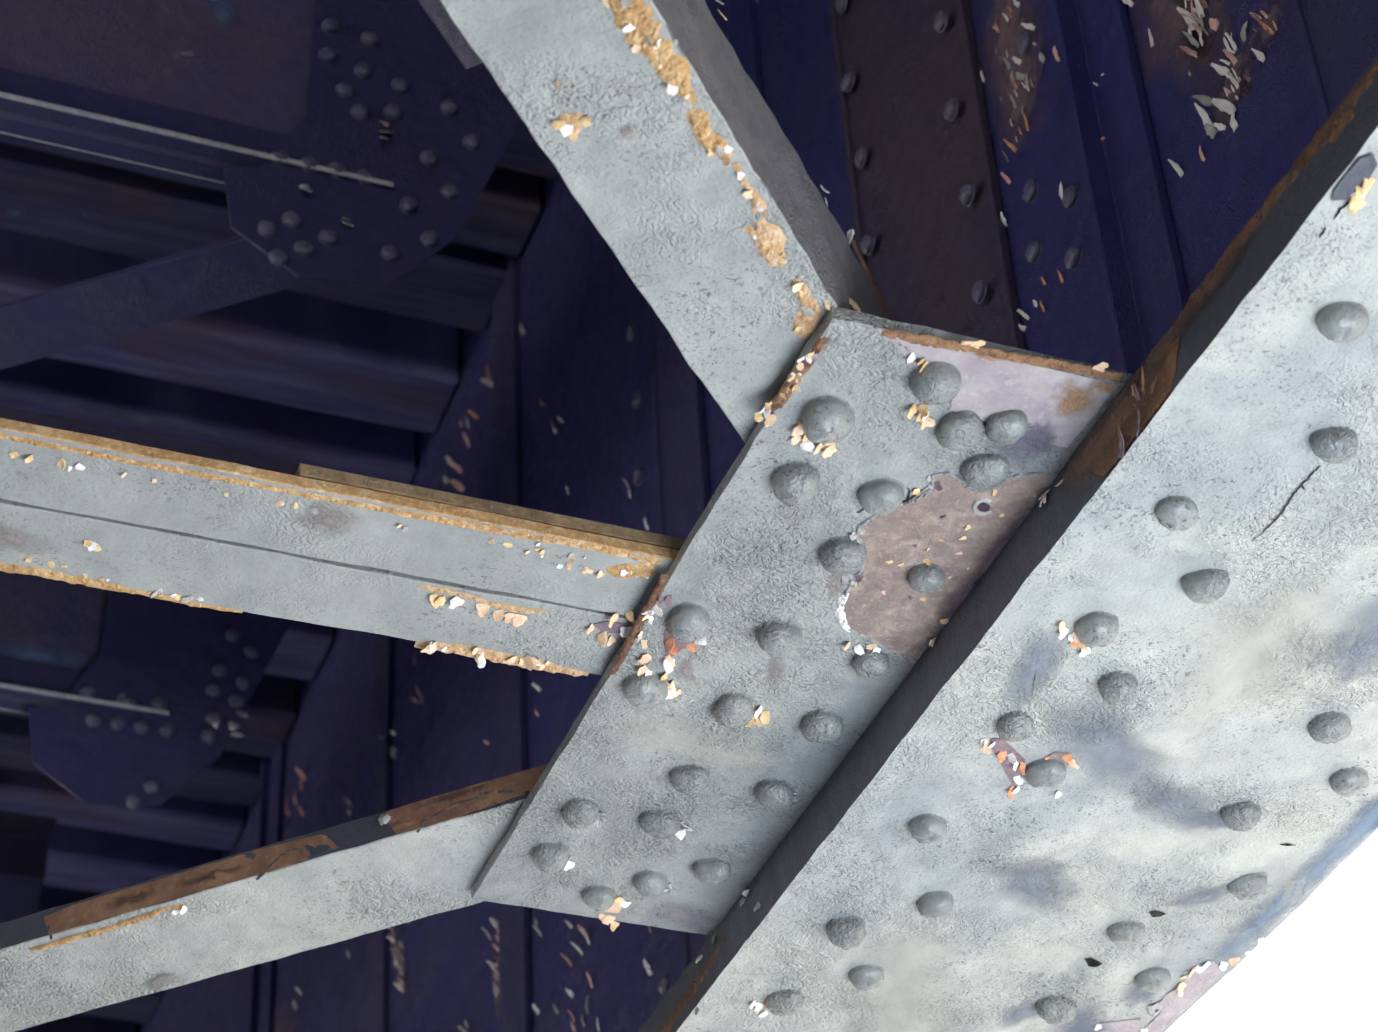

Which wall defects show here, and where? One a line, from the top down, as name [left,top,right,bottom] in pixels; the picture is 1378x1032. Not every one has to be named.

peeling [1122,0,1278,162]
peeling [1168,159,1184,178]
corrosion [846,61,1378,483]
crack [1251,466,1320,542]
spalling [83,540,102,552]
peeling [834,471,1064,662]
peeling [416,585,548,627]
peeling [637,630,708,700]
peeling [980,738,1026,799]
corrosion [28,905,187,951]
spalling [1085,958,1102,967]
peeling [1094,938,1265,1032]